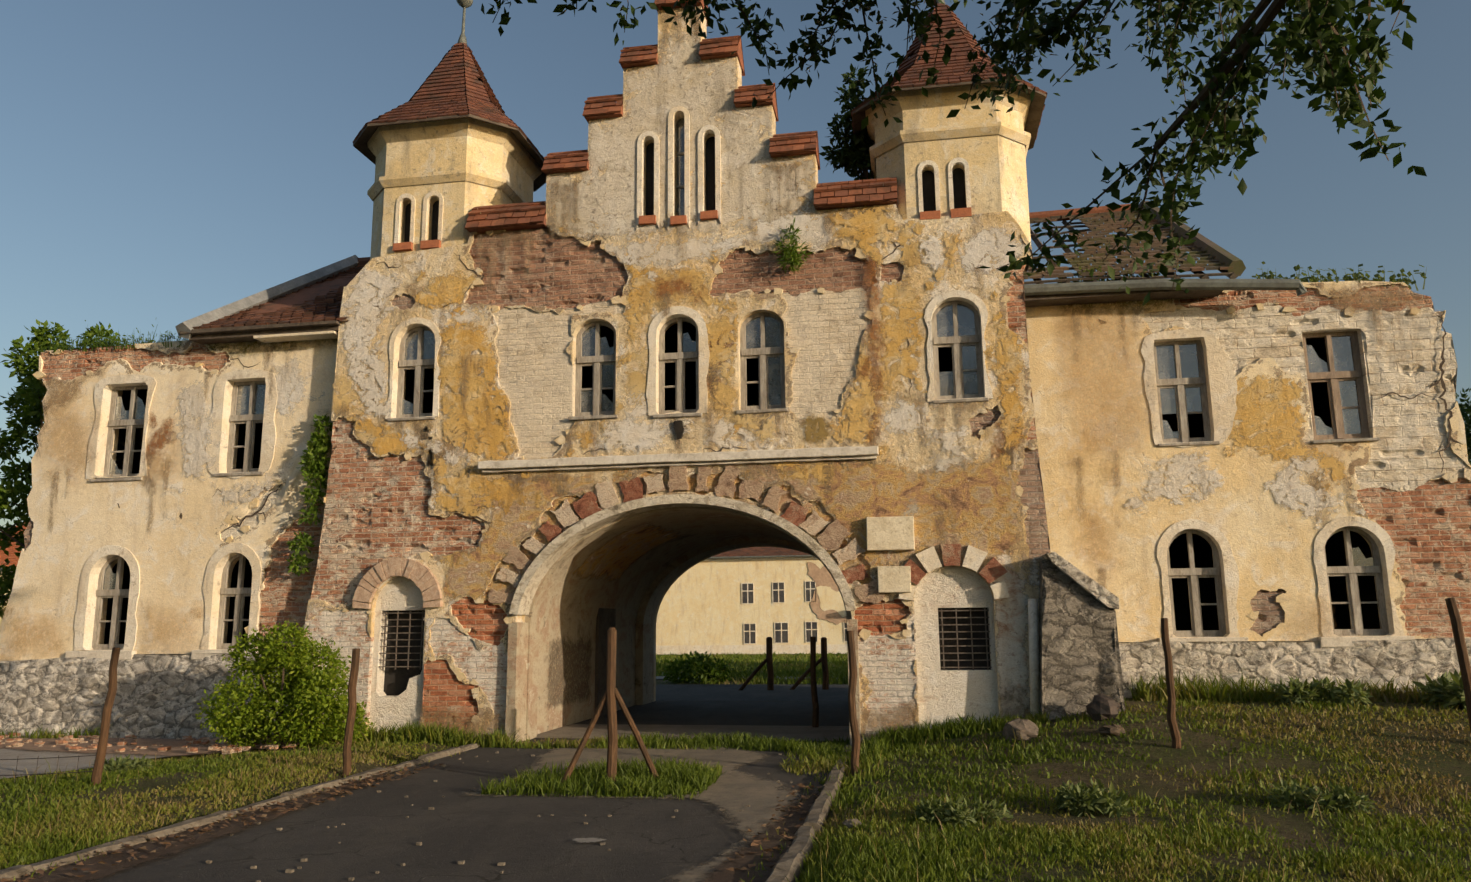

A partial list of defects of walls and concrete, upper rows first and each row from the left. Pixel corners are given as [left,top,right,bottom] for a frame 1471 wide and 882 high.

flaking render [32,33,1051,741]
flaking render [1124,281,1471,639]
crack [1371,315,1463,472]